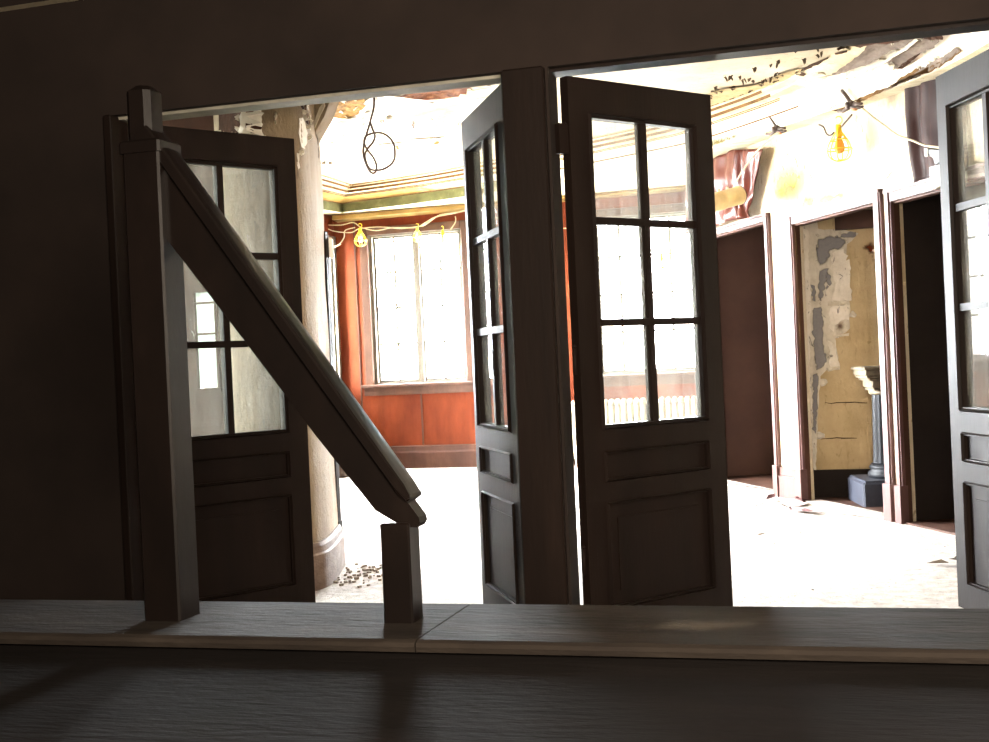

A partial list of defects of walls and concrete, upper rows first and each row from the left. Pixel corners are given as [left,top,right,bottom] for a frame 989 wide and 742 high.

peeling [708,49,823,106]
spalling [817,36,960,87]
peeling [297,87,474,170]
peeling [803,229,857,439]